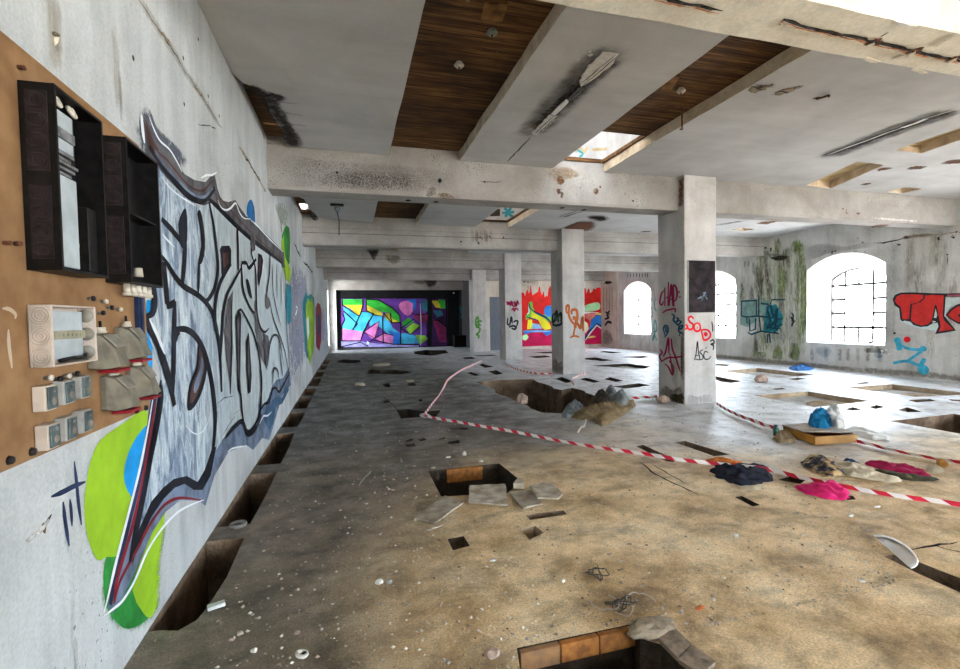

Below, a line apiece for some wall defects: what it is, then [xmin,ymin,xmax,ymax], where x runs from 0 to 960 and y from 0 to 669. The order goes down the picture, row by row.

crack [140,2,221,129]
spalling [748,83,802,96]
crack [772,18,960,65]
peeling [822,108,960,157]
rust [555,168,577,198]
damp [759,240,807,345]